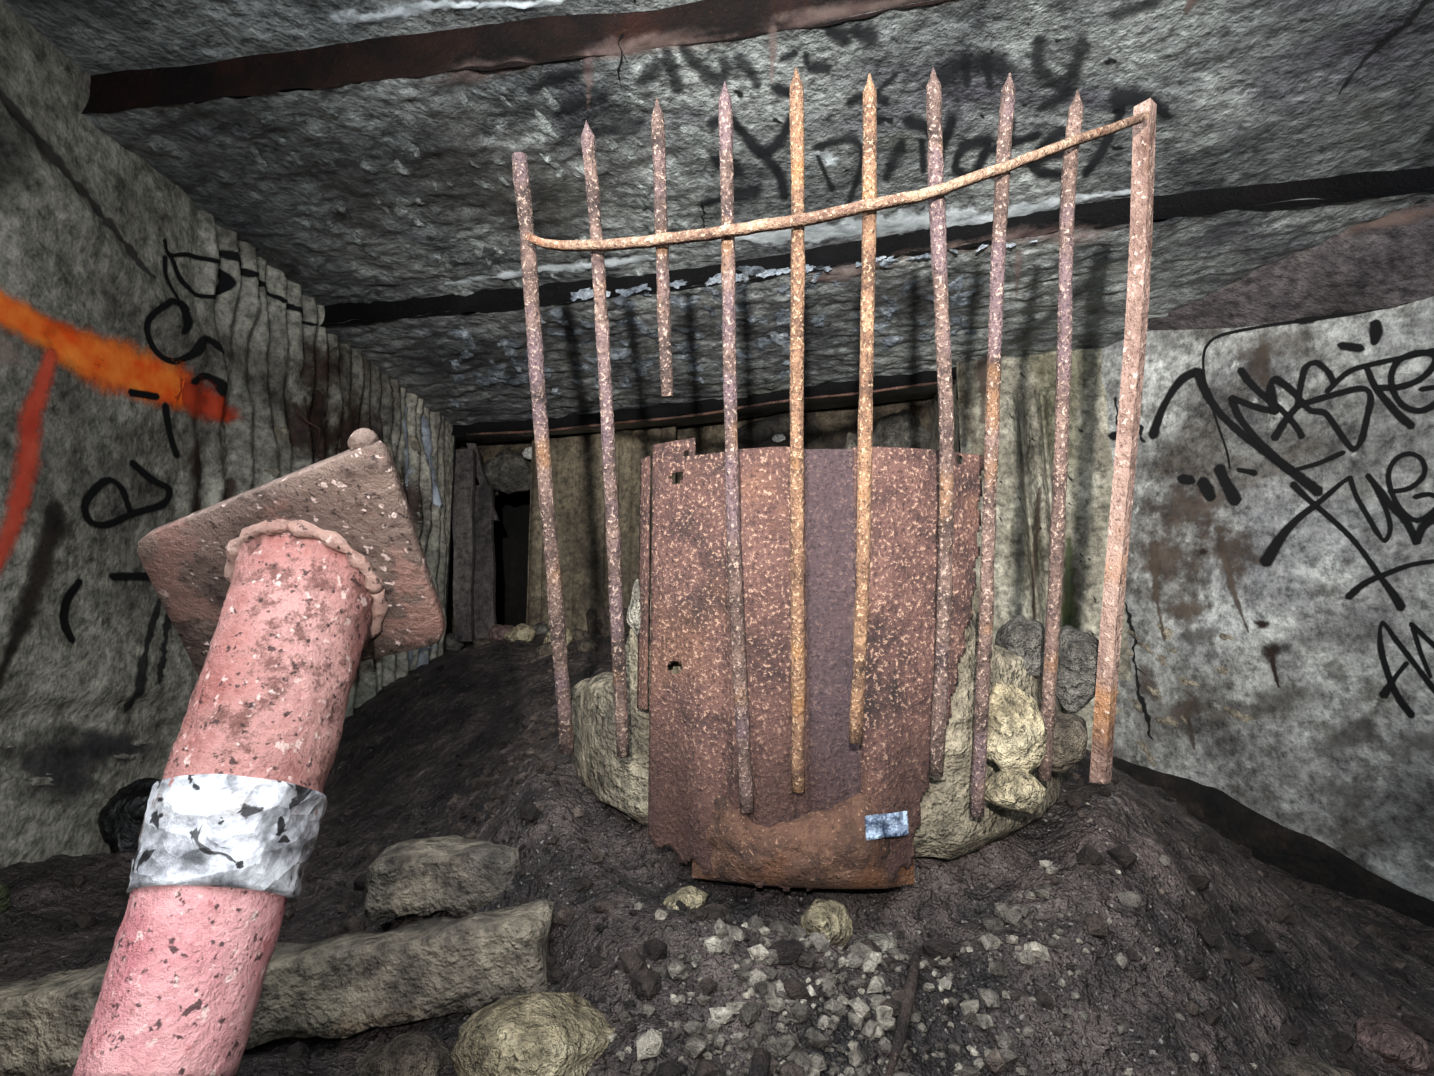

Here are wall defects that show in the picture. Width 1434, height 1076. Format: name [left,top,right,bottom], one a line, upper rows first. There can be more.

crack [617,34,628,88]
leakage [402,405,443,507]
leakage [1140,484,1261,641]
crack [1124,602,1153,739]
leakage [1171,694,1197,749]